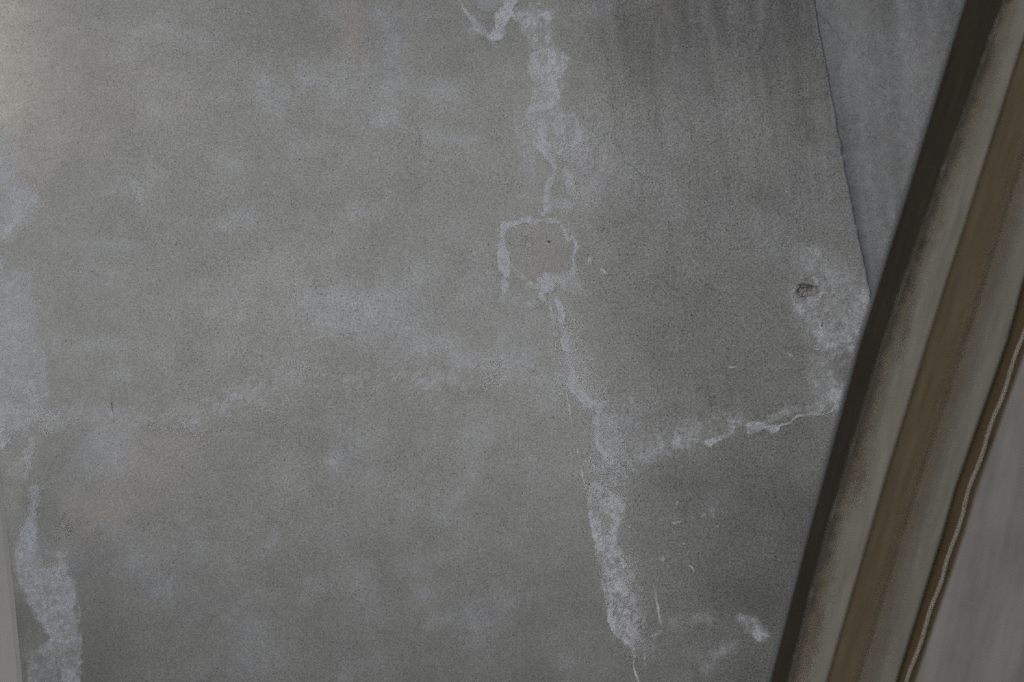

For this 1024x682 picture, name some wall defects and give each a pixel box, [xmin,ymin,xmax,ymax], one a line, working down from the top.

damp [15,487,75,647]
damp [461,0,842,649]